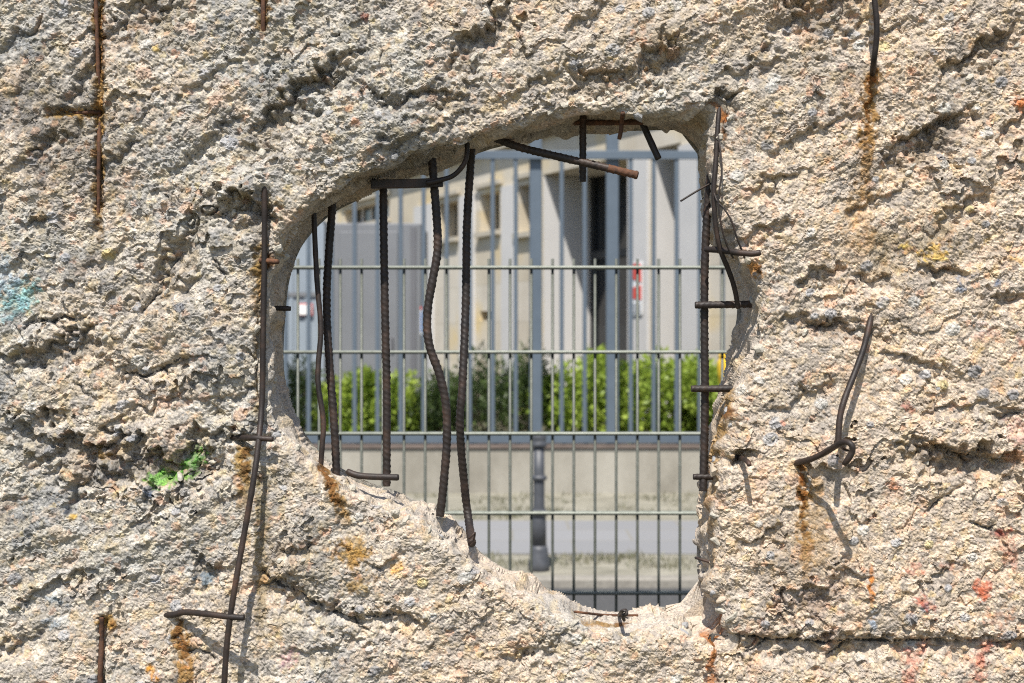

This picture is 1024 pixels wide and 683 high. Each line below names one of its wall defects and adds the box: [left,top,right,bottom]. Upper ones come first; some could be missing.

corrosion [47,0,105,229]
spalling [494,37,680,182]
corrosion [858,68,882,176]
spalling [691,89,761,491]
spalling [302,142,476,547]
corrosion [170,620,194,683]
spalling [272,542,316,564]
corrosion [317,464,349,516]
corrosion [338,538,373,592]
spalling [709,511,725,546]
spalling [710,590,738,623]
corrosion [796,464,814,556]